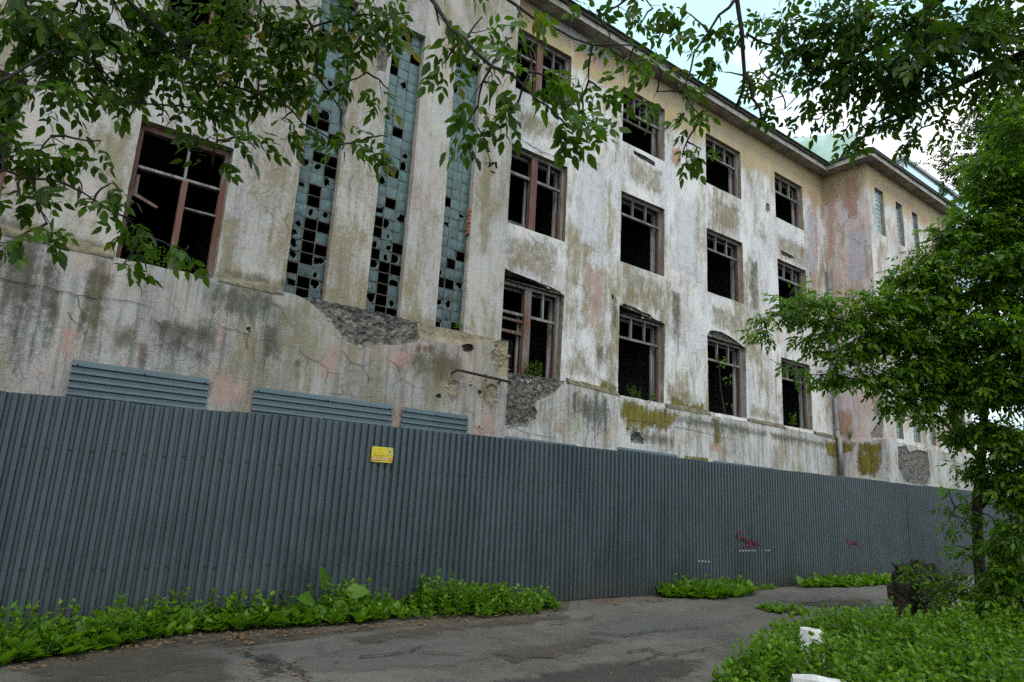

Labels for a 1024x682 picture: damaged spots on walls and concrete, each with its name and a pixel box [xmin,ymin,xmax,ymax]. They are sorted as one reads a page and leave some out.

damp [81,261,107,343]
damp [213,269,284,321]
damp [159,320,215,356]
flaking render [302,290,565,428]
damp [627,403,672,443]
flaking render [898,446,930,486]